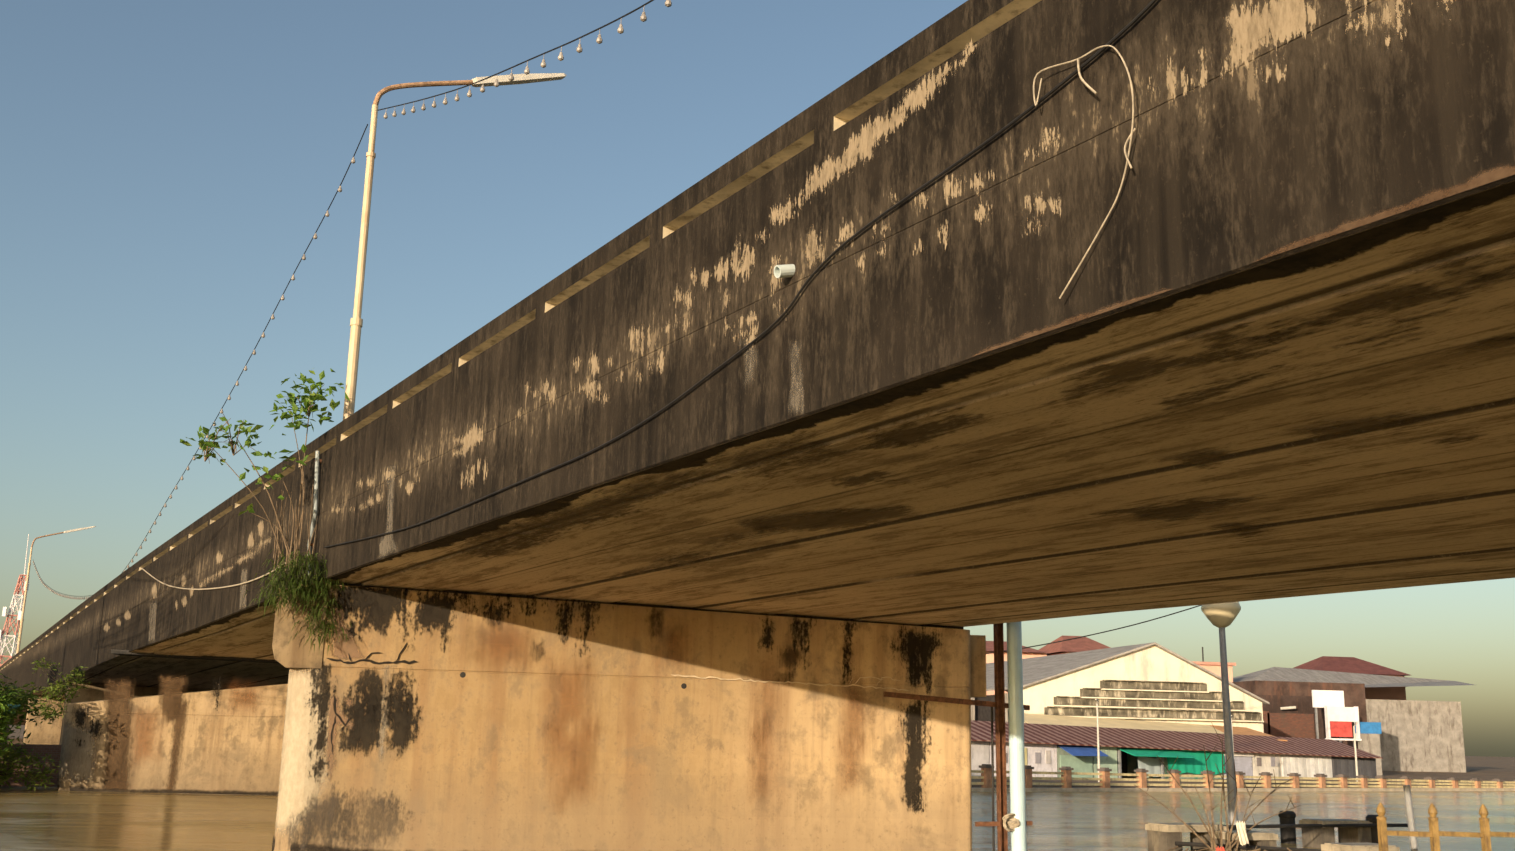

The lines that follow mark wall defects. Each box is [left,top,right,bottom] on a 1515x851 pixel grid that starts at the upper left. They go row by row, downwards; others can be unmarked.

peeling [1148,0,1316,100]
peeling [1345,0,1412,47]
peeling [571,38,997,403]
peeling [452,421,488,489]
peeling [518,379,557,419]
water stain [321,181,1515,656]
water stain [758,614,817,681]
water stain [840,619,860,684]
water stain [57,662,421,851]
water stain [891,625,942,812]